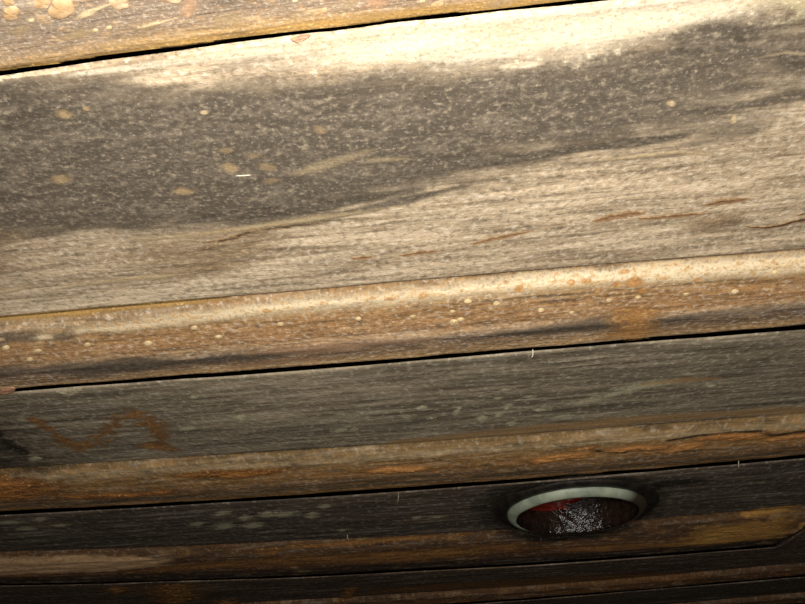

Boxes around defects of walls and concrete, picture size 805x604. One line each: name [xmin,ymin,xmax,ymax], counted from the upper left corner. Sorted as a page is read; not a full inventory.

leakage [0,0,805,241]
crack [747,212,805,229]